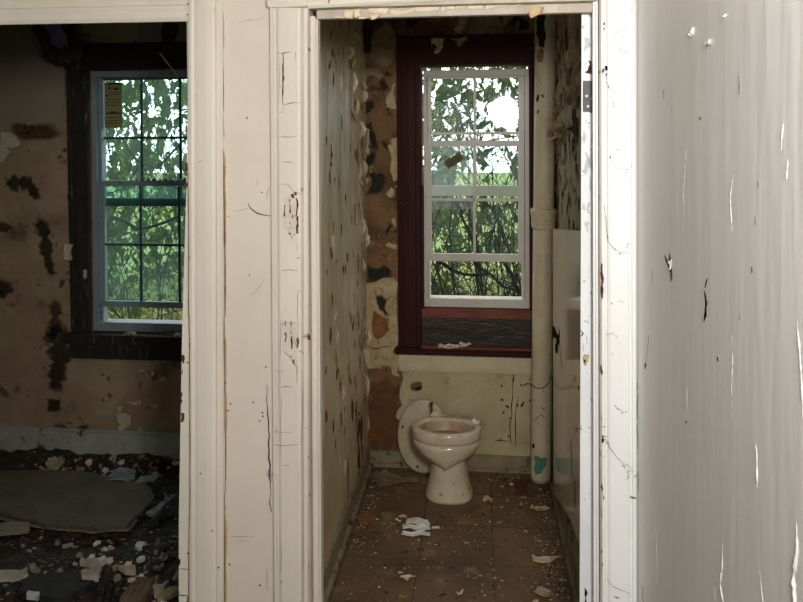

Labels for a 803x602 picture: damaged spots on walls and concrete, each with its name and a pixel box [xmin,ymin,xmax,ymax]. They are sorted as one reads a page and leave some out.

damp [13,123,57,139]
spalling [0,132,20,162]
damp [8,175,40,199]
peeling [281,184,302,238]
damp [36,220,54,275]
peeling [63,243,73,261]
peeling [325,4,592,493]
damp [0,281,13,299]
damp [44,302,70,390]
damp [47,399,60,411]
crack [266,386,303,524]